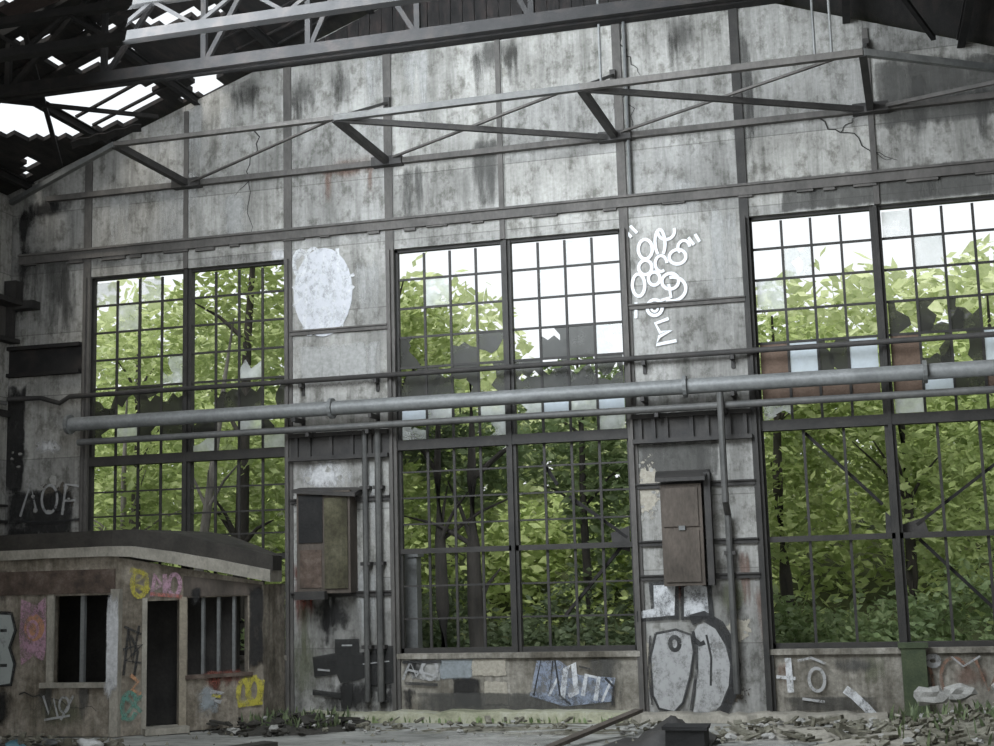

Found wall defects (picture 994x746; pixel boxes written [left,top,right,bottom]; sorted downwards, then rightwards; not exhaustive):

damp [409,51,427,103]
damp [473,43,517,76]
damp [403,168,422,213]
damp [474,141,496,202]